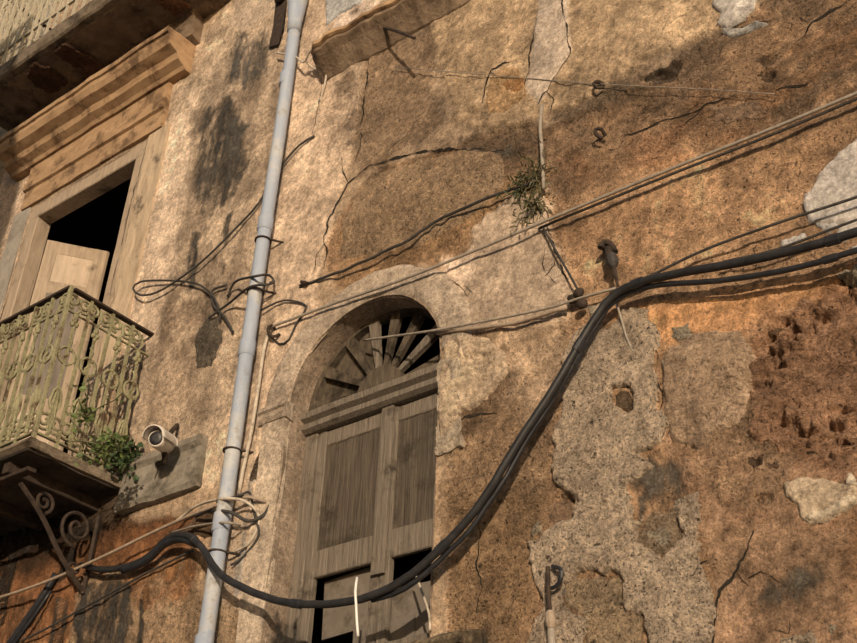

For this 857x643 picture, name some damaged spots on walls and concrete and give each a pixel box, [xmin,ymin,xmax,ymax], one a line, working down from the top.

flaking render [54,43,104,77]
damp [195,96,249,242]
crack [314,62,504,269]
crack [482,0,571,114]
crack [626,95,734,135]
damp [187,233,200,289]
spalling [748,265,857,525]
peeling [527,302,718,643]
damp [48,580,147,643]
crack [711,531,789,643]